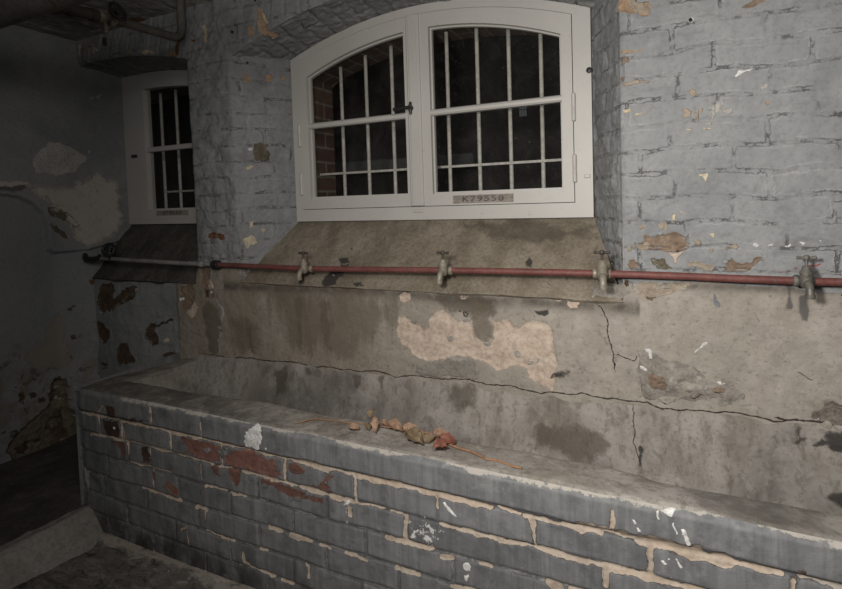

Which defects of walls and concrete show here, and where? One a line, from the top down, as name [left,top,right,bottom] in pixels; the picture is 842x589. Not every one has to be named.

spalling [89,279,138,345]
spalling [397,310,561,391]
crack [596,303,637,372]
peeling [591,280,691,301]
peeling [626,211,714,271]
peeling [722,244,764,272]
spalling [6,376,77,460]
peeling [179,436,334,503]
crack [203,353,824,463]
spalling [811,401,842,431]
damp [813,431,842,452]
damp [828,493,842,507]